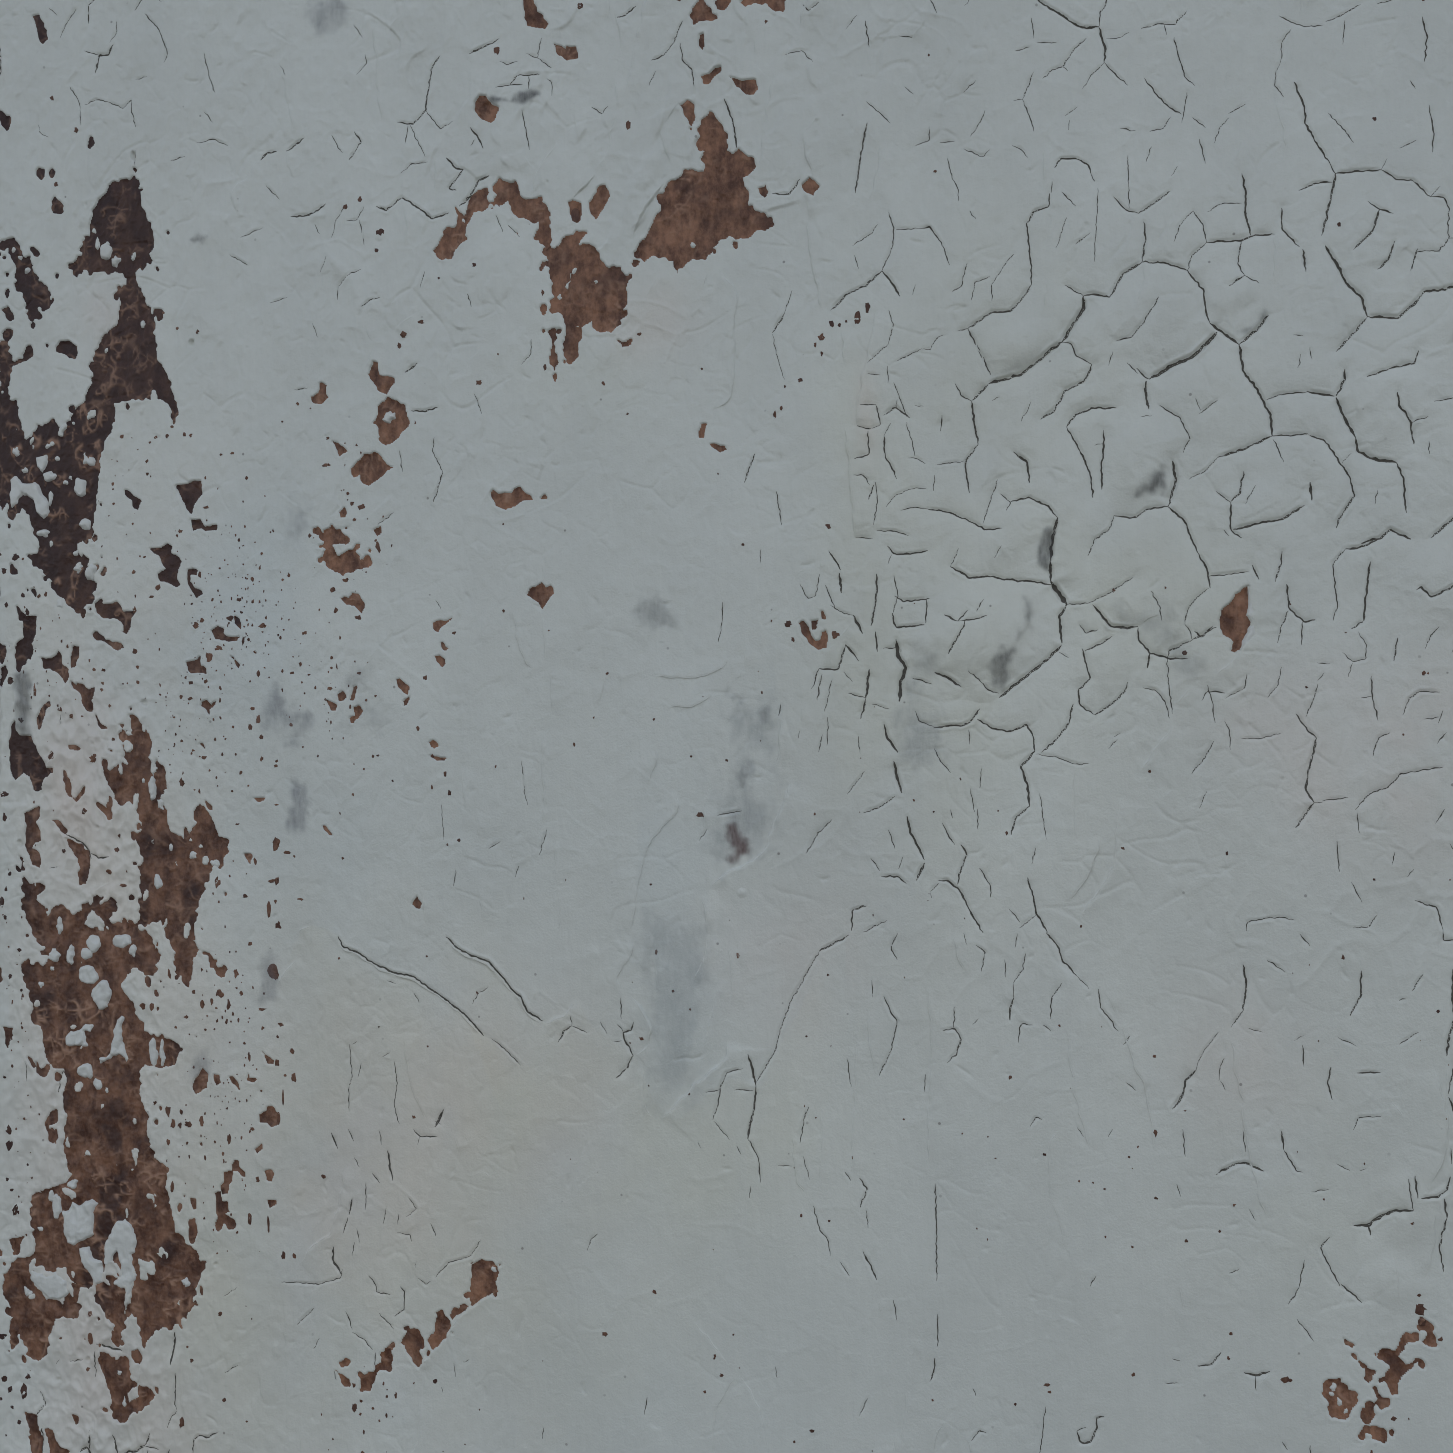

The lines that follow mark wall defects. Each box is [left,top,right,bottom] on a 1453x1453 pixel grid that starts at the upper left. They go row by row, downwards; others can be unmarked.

peeling [523,0,578,60]
peeling [690,0,786,50]
peeling [433,96,774,382]
peeling [333,361,410,486]
peeling [313,507,382,576]
crack [698,0,1453,1340]
peeling [1219,586,1255,652]
peeling [0,168,257,1453]
crack [338,937,634,1078]
crack [286,1042,480,1379]
peeling [335,1259,500,1392]
peeling [1322,1317,1438,1443]